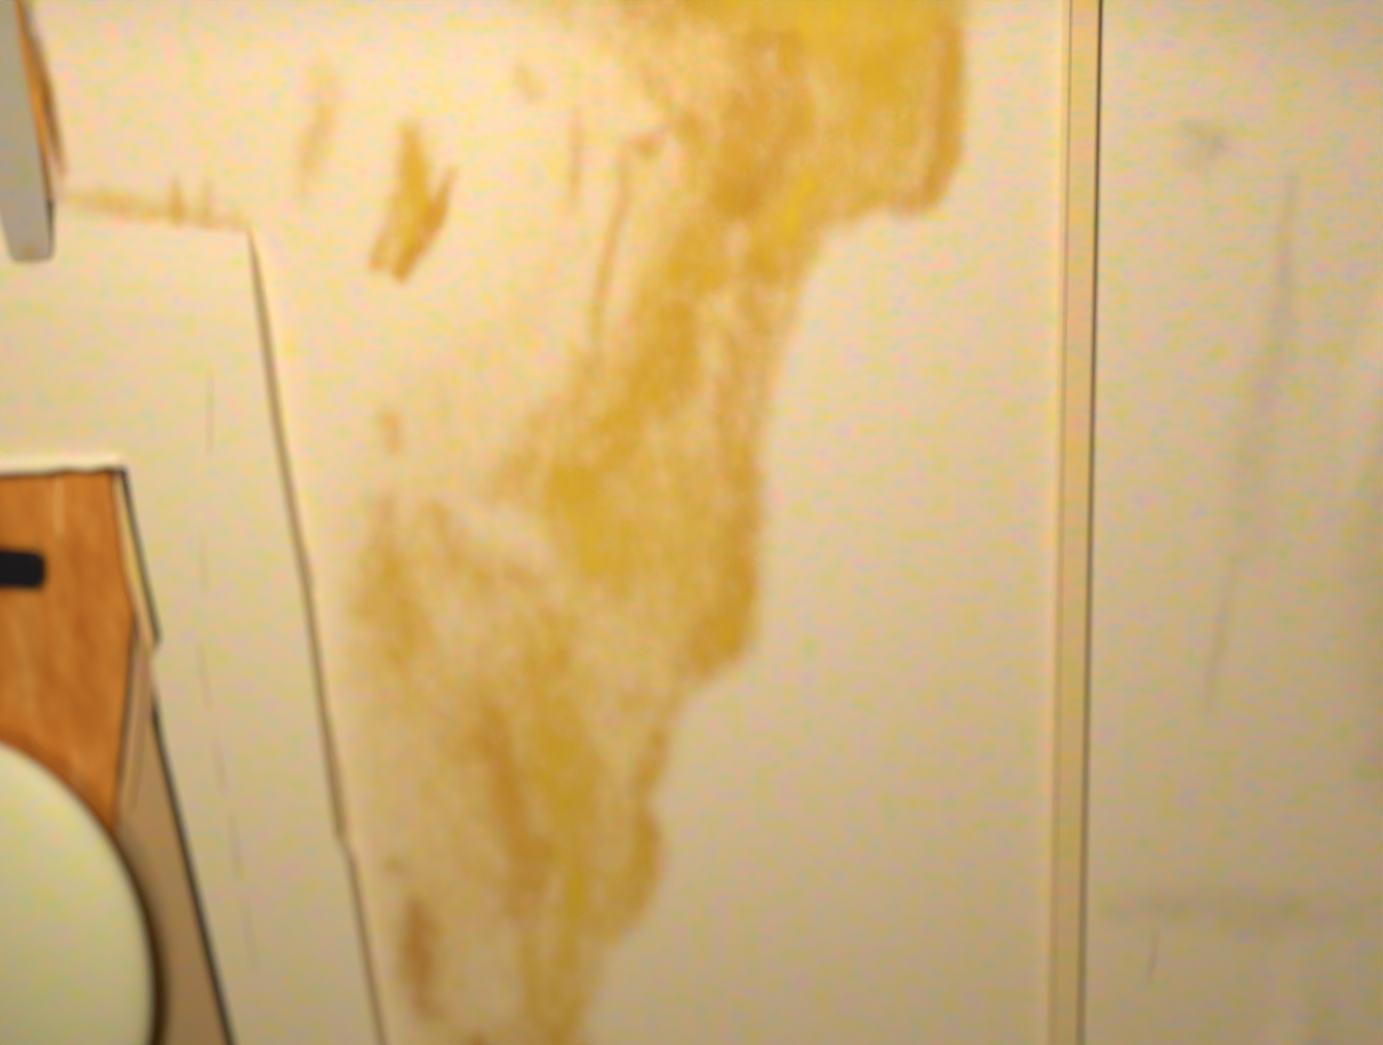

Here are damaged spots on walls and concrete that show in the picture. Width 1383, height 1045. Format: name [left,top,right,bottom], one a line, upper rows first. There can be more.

damp [713,0,937,140]
damp [928,49,957,200]
damp [395,164,444,273]
damp [755,163,825,276]
damp [480,733,586,967]